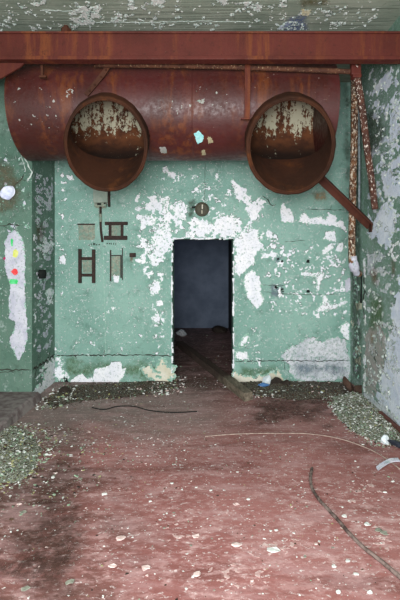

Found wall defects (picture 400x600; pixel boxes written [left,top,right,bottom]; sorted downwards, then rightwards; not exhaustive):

peeling [0,0,62,31]
peeling [64,0,220,31]
peeling [212,0,379,31]
peeling [132,66,400,426]
peeling [0,168,126,393]